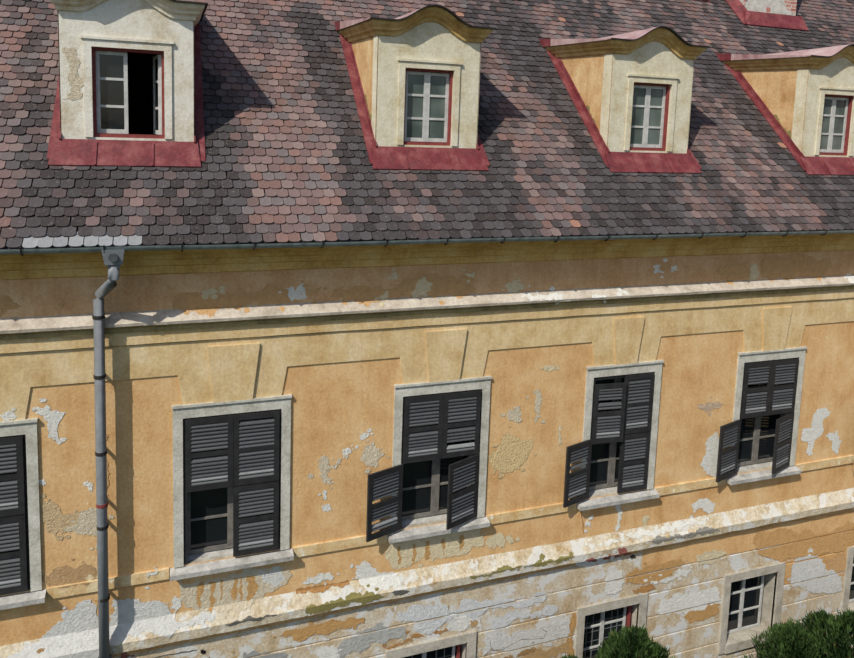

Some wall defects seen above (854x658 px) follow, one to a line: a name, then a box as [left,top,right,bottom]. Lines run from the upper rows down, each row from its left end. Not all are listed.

flaking render [32,398,67,445]
flaking render [801,408,842,456]
flaking render [307,428,389,512]
flaking render [39,479,97,550]
flaking render [7,565,293,658]
flaking render [302,572,340,586]
flaking render [350,528,520,595]
flaking render [316,591,570,658]
flaking render [787,548,842,594]